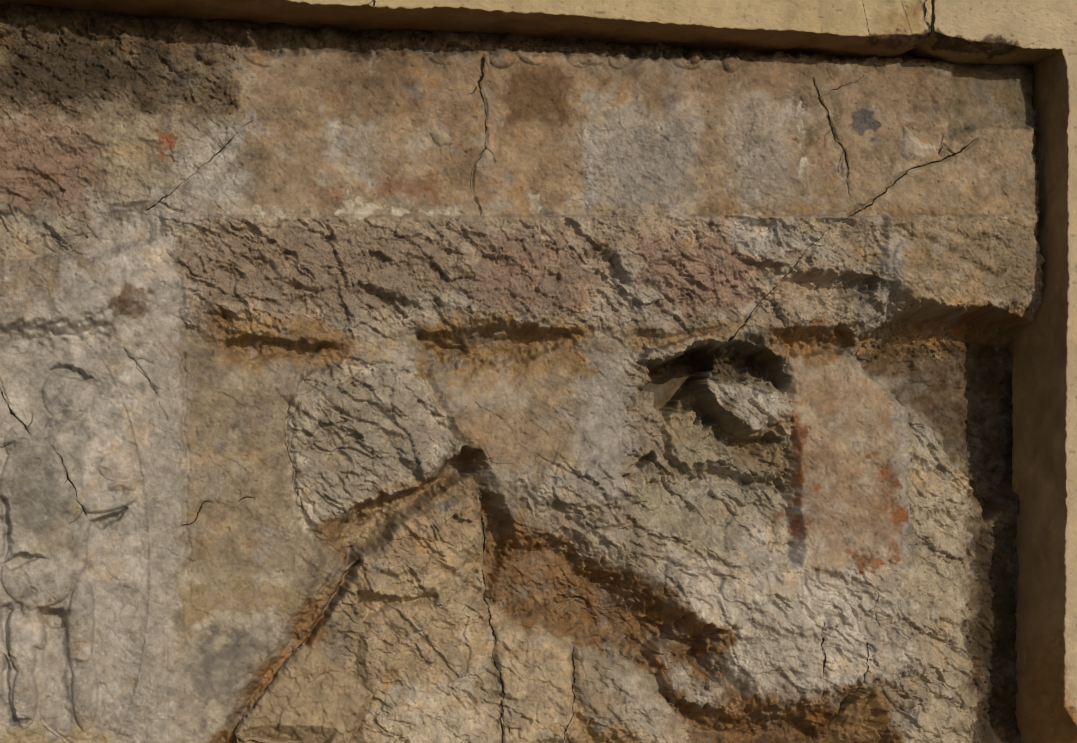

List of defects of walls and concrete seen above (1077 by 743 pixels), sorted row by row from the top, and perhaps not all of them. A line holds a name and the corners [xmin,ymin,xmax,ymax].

crack [924,0,935,34]
crack [147,120,254,211]
crack [467,57,496,212]
crack [728,79,974,341]
crack [0,388,33,448]
rust [867,455,908,523]
rust [774,513,813,540]
rust [847,547,901,574]